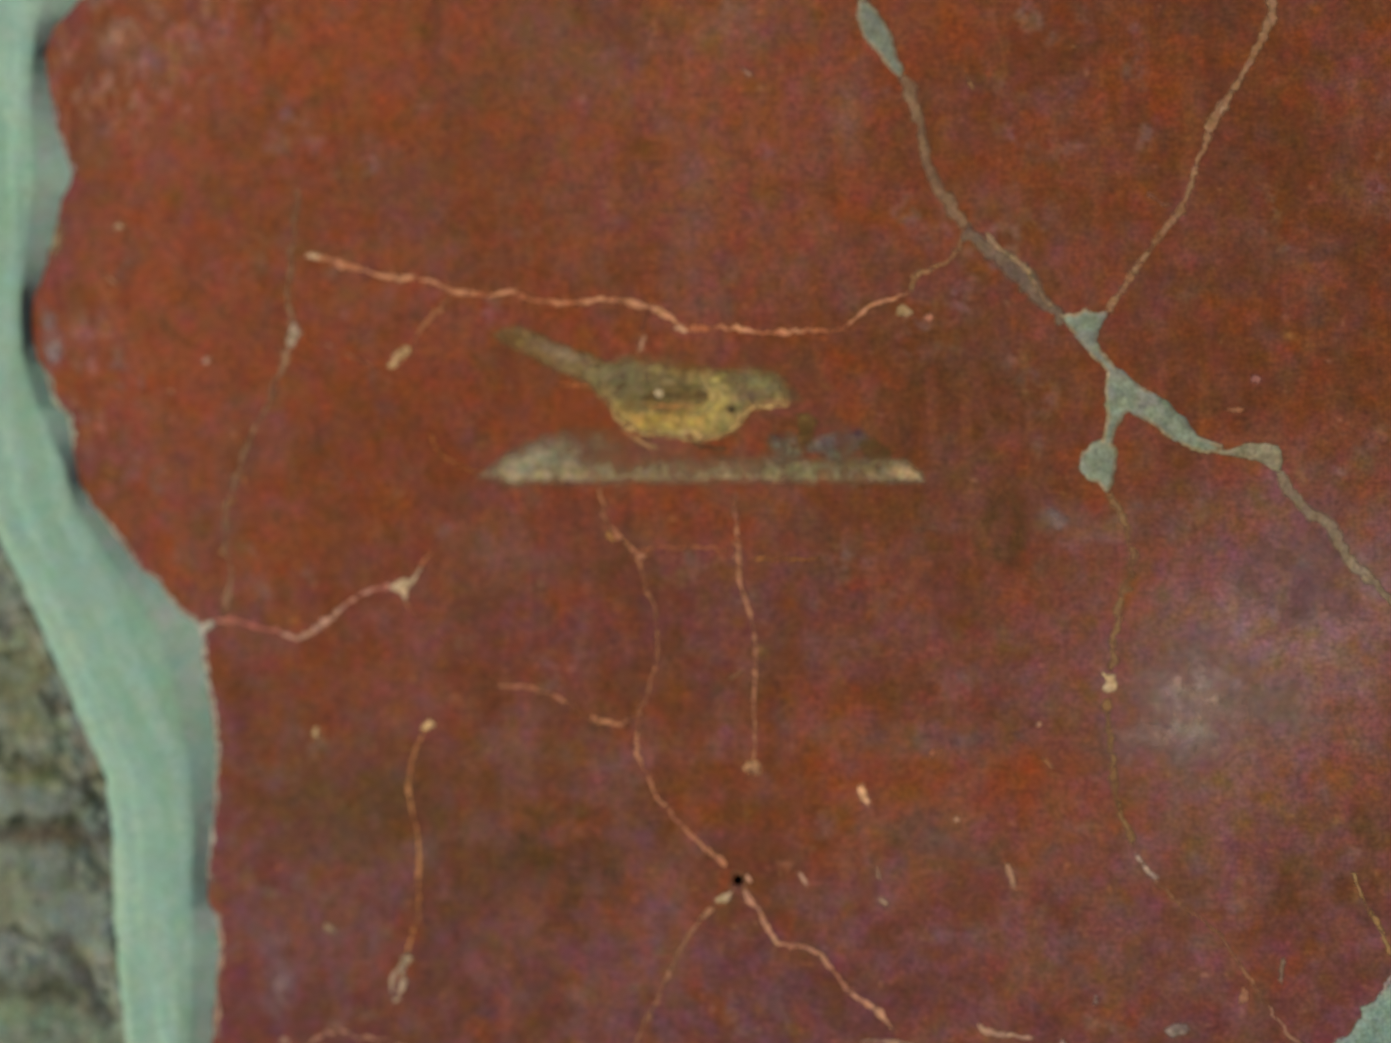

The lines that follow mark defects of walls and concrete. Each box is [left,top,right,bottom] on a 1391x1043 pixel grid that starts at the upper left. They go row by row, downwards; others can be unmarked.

crack [196,190,432,641]
crack [307,0,1391,1043]